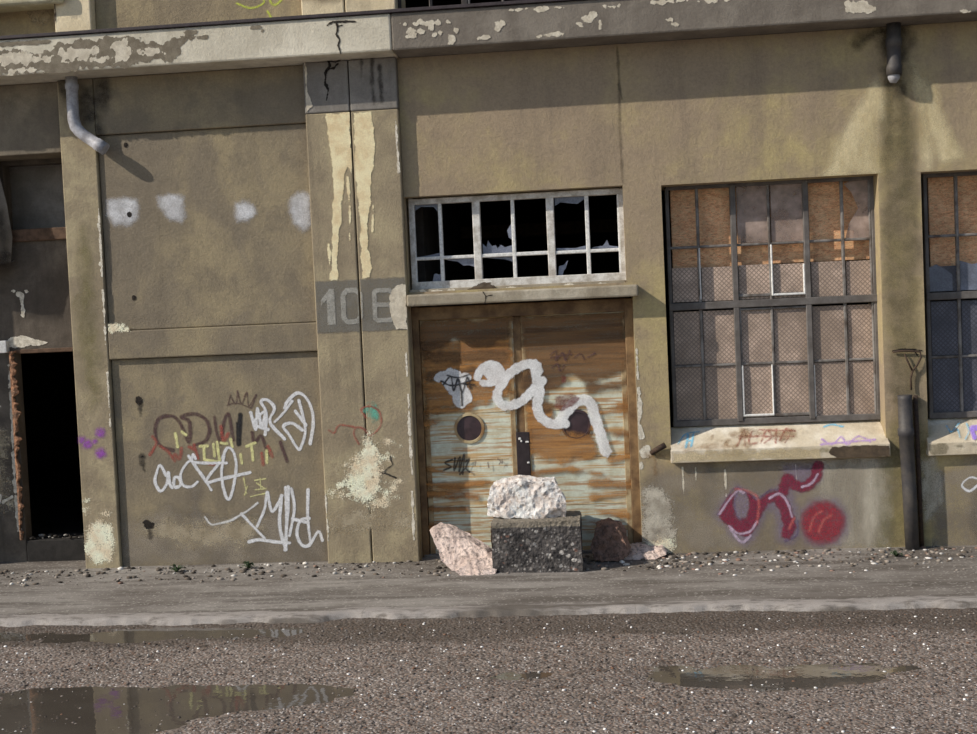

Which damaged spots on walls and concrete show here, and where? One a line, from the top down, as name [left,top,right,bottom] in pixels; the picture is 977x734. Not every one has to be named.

peeling [0,30,208,76]
crack [324,20,356,101]
peeling [477,6,564,40]
peeling [576,3,621,30]
peeling [844,0,876,14]
damp [826,79,962,238]
spalling [11,290,29,318]
spalling [0,335,47,540]
spalling [82,497,116,565]
spalling [325,394,415,541]
rust [427,467,488,532]
rust [420,313,631,500]